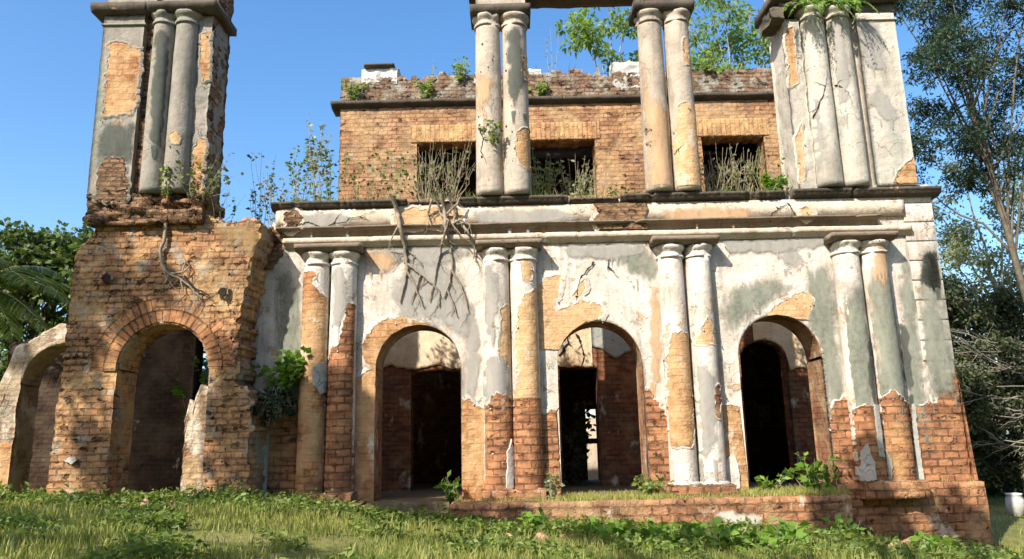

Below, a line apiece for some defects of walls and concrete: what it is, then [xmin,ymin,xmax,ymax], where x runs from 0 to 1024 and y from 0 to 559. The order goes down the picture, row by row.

flaking render [100,39,144,121]
crack [812,71,851,118]
flaking render [168,129,209,195]
flaking render [670,100,701,187]
flaking render [892,155,918,184]
crack [297,211,375,226]
crack [573,259,619,303]
flaking render [764,287,815,321]
flaking render [267,268,427,503]
flaking render [461,259,609,500]
flaking render [644,315,716,495]
flaking render [829,375,971,484]